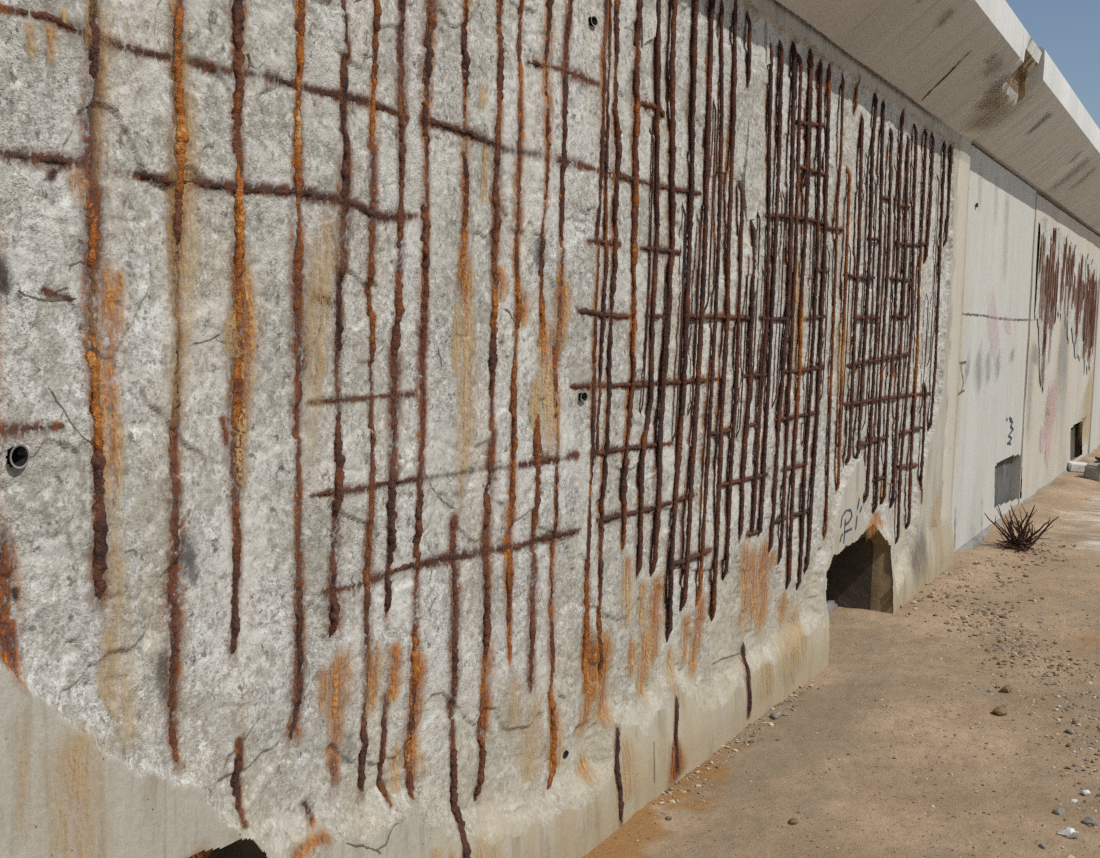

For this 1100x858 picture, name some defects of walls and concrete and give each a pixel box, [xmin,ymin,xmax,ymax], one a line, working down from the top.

corrosion [139,48,402,114]
spalling [1006,50,1038,94]
corrosion [136,117,398,222]
corrosion [99,272,124,497]
corrosion [225,259,256,484]
corrosion [364,264,578,491]
spalling [1035,217,1100,393]
corrosion [0,532,23,683]
corrosion [367,644,426,789]
corrosion [420,537,546,570]
corrosion [480,652,491,734]
corrosion [622,559,706,695]